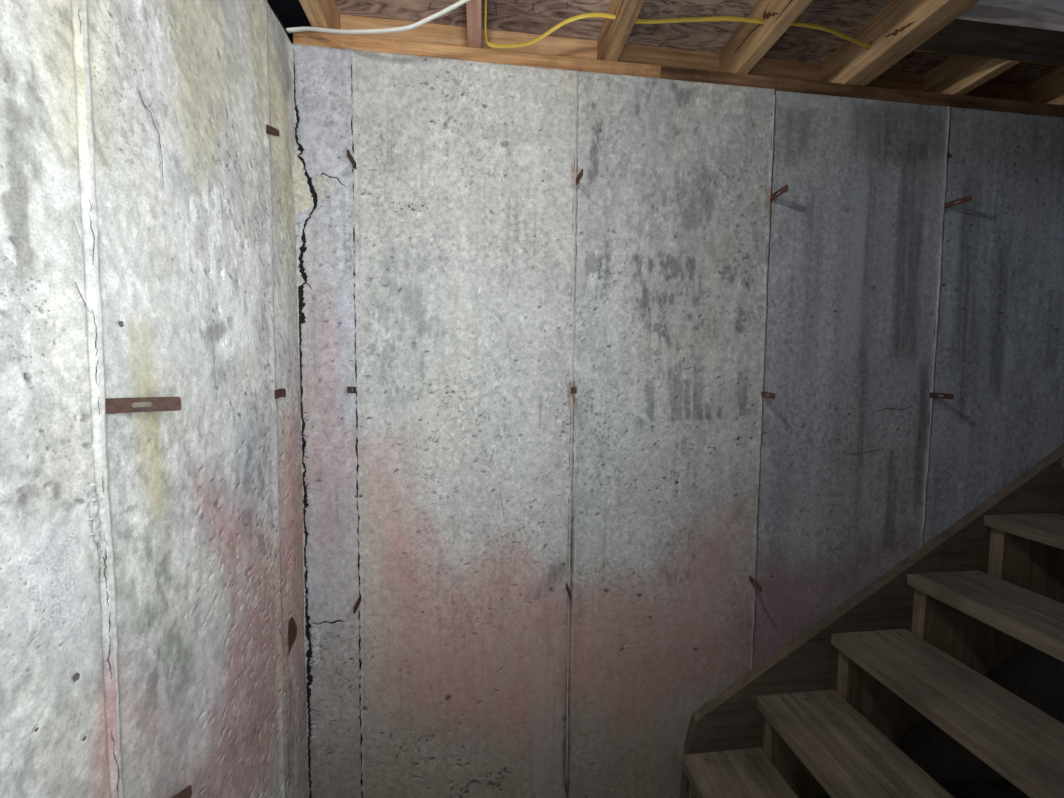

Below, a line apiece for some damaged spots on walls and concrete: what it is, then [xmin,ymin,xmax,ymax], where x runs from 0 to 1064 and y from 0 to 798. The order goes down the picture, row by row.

crack [294,63,347,798]